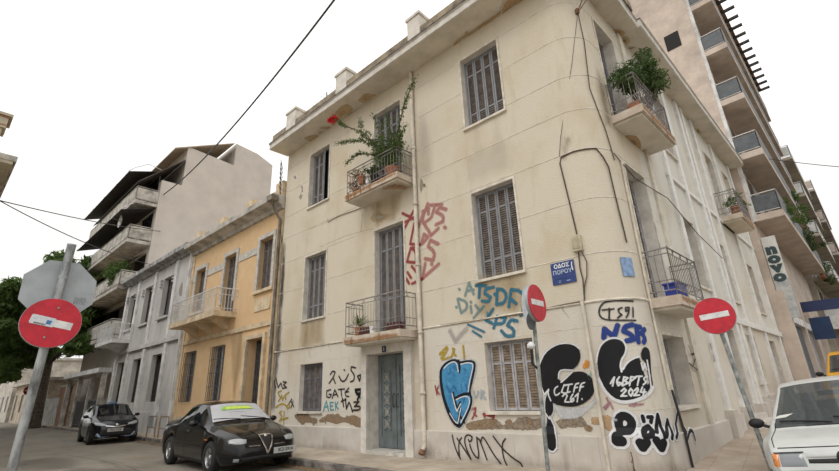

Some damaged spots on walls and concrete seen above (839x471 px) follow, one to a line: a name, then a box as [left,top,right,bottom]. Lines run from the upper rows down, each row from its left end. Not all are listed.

flaking render [295,413,361,428]
flaking render [466,417,542,430]